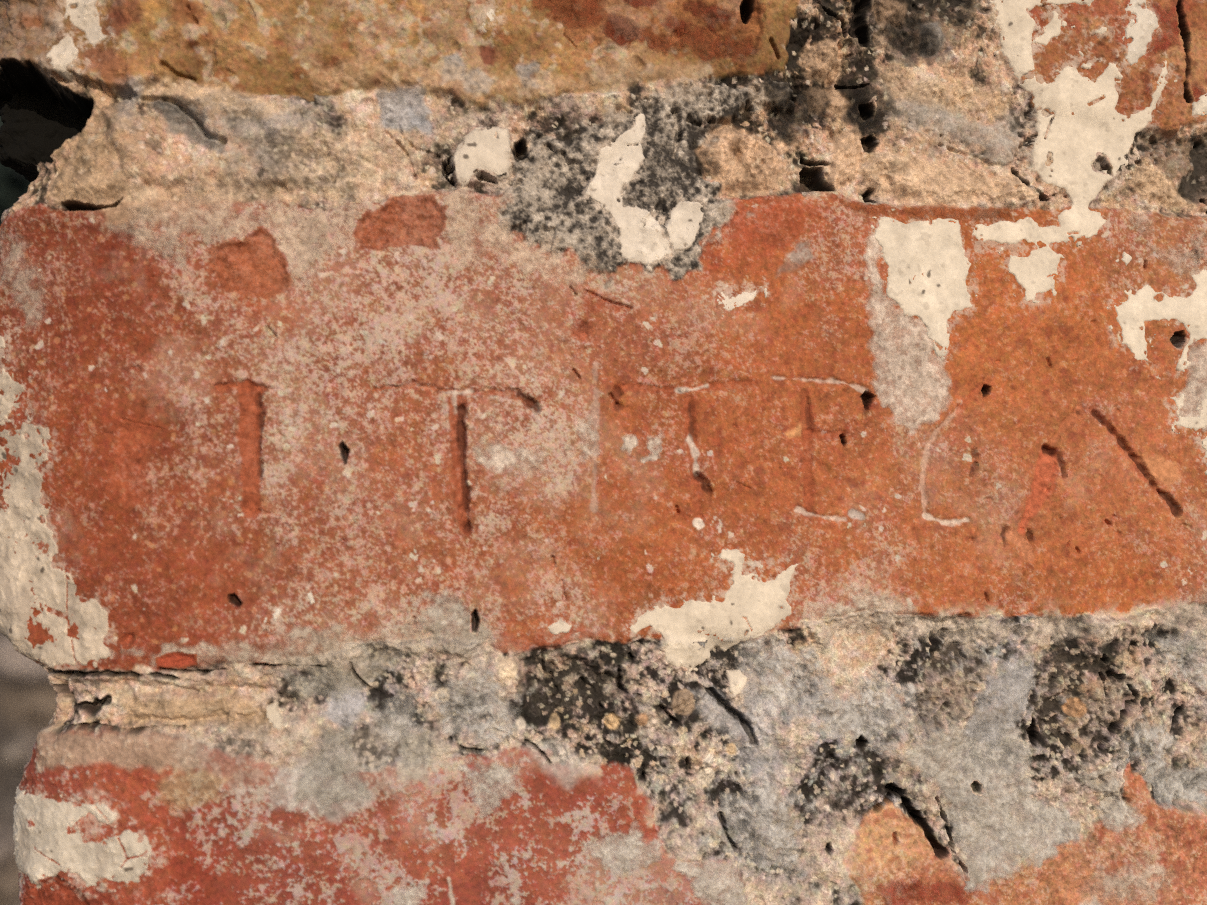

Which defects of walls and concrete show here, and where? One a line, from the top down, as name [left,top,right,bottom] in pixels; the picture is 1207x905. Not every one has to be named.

crack [1176,0,1195,104]
spalling [446,0,797,284]
peeling [813,0,1207,372]
peeling [1170,390,1207,475]
peeling [0,330,117,671]
peeling [630,548,798,675]
peeling [726,668,750,697]
crack [873,782,970,881]